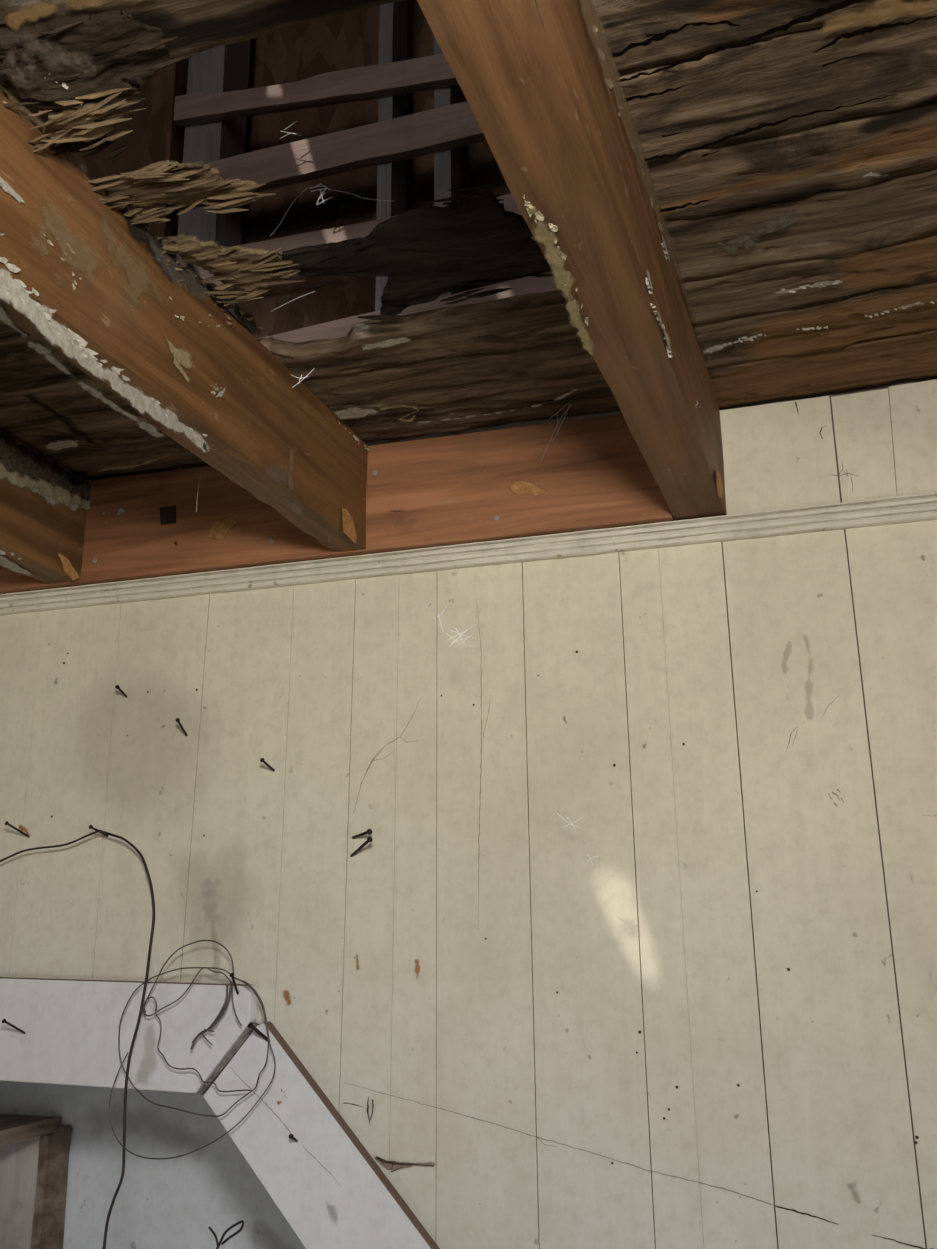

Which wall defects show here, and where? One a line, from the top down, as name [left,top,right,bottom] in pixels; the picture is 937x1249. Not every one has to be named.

water stain [0,35,96,90]
crack [609,0,937,102]
spalling [27,87,146,153]
crack [645,94,896,161]
peeling [36,204,97,291]
spalling [162,233,302,327]
peeling [581,0,766,362]
crack [660,197,717,212]
peeling [0,257,209,452]
crack [344,1082,839,1225]
crack [872,1235,932,1249]